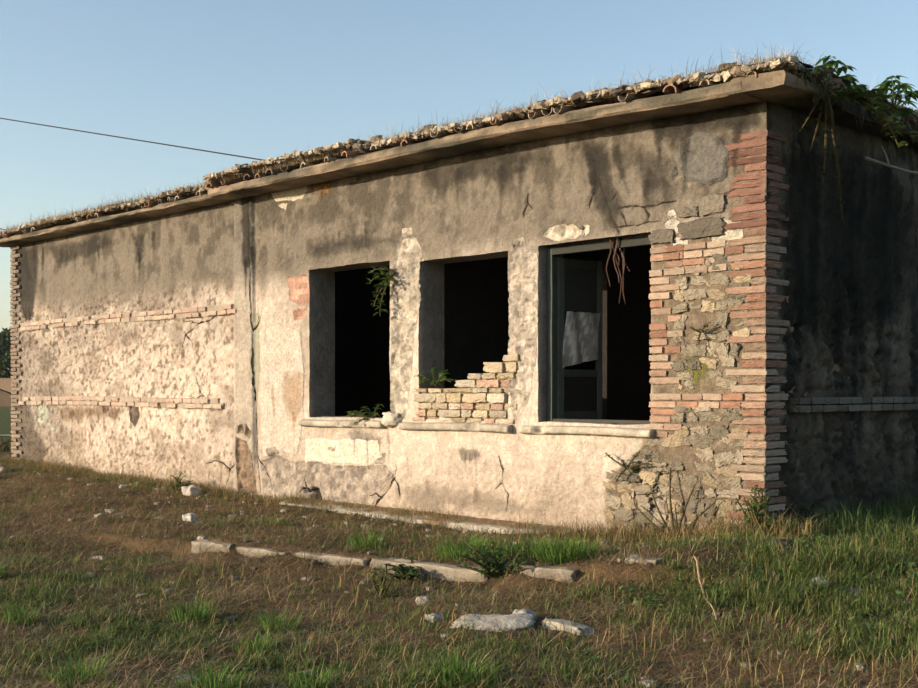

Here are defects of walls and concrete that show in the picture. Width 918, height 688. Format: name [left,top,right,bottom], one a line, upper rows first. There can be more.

damp [241,196,254,294]
spalling [543,224,590,241]
damp [586,145,621,229]
crack [589,164,674,234]
damp [788,157,906,345]
crack [182,316,216,347]
crack [248,217,272,490]
peeling [235,275,393,505]
spalling [390,228,424,420]
spalling [507,237,538,420]
crack [369,468,400,506]
spalling [619,455,667,516]